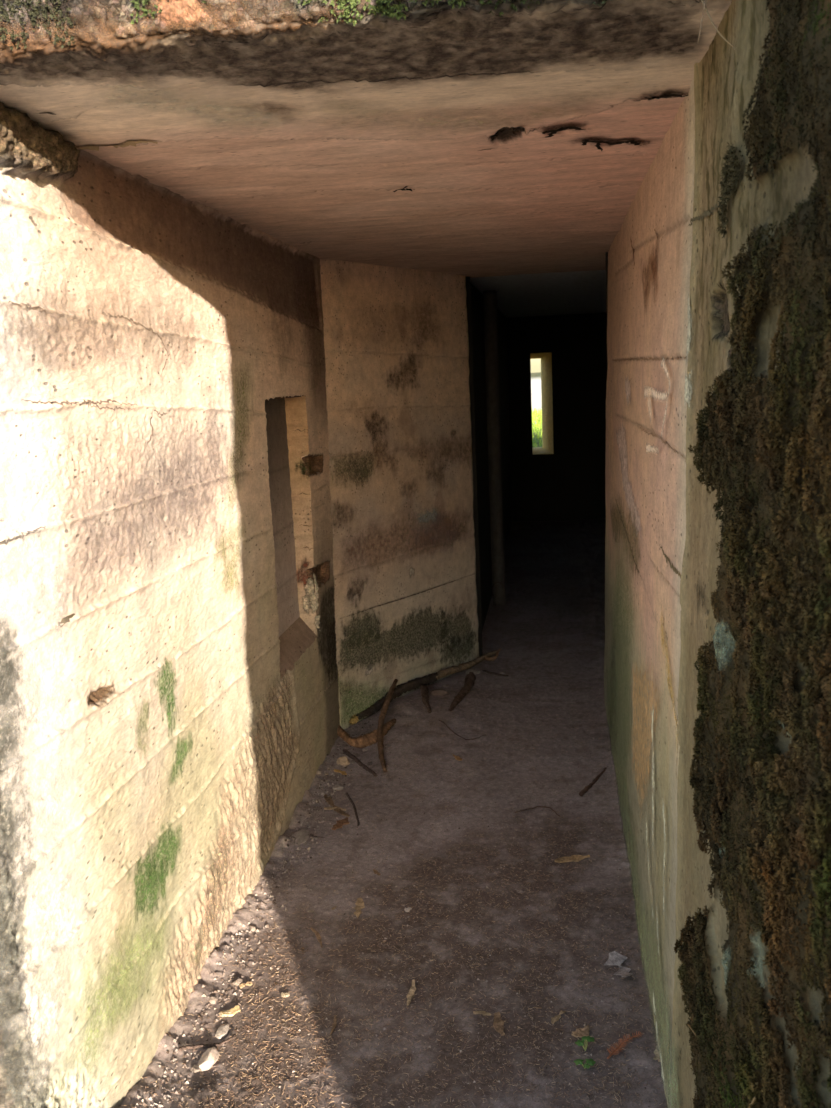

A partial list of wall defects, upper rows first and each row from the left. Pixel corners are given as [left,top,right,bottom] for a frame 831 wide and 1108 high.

spalling [490,127,525,142]
crack [21,399,165,444]
spalling [87,685,115,707]